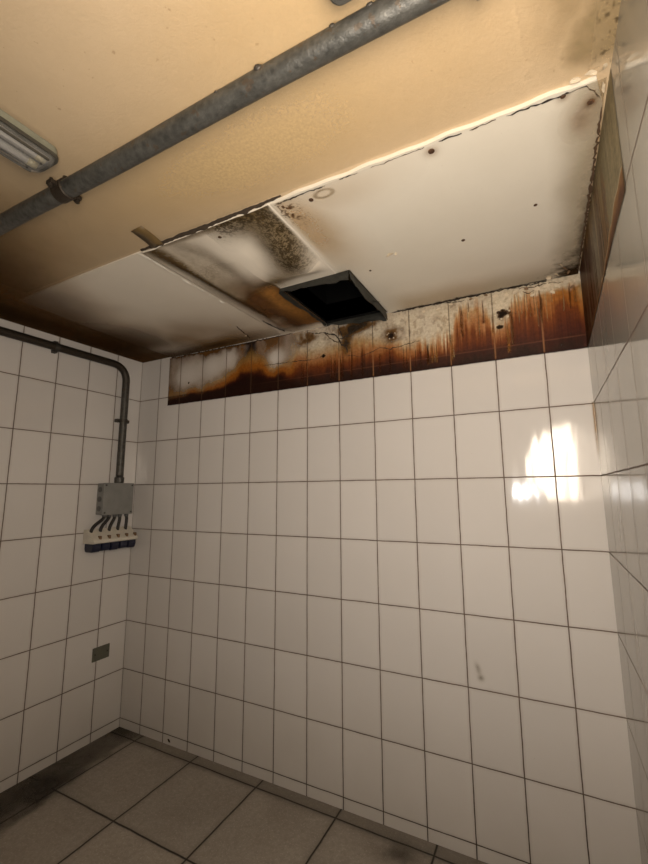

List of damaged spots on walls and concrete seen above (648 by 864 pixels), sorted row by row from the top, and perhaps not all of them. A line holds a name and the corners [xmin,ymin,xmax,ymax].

leakage [211,203,327,271]
rust [167,70,625,406]
crack [277,86,602,270]
crack [392,281,561,313]